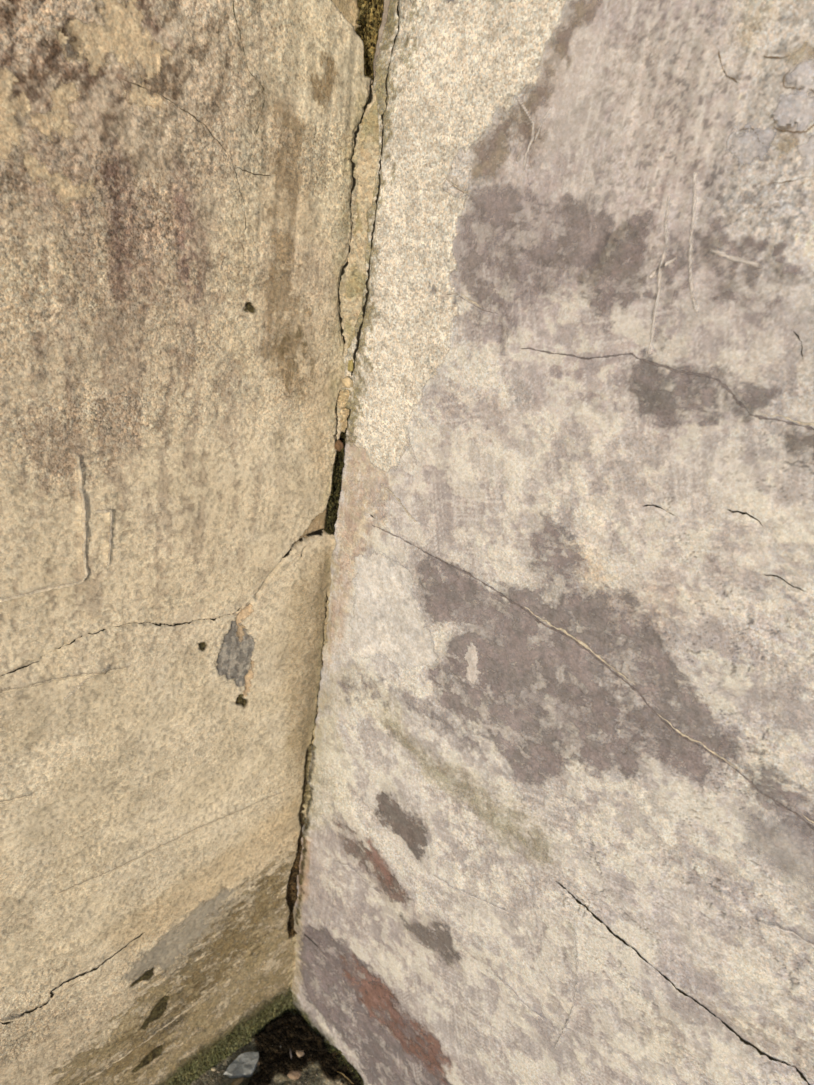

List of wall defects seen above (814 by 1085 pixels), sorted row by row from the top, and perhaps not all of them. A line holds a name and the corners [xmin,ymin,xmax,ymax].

crack [335,1,399,443]
water stain [460,0,657,325]
water stain [711,219,800,283]
crack [280,529,323,566]
crack [2,608,240,676]
water stain [405,517,740,785]
crack [289,594,328,952]
water stain [337,823,460,964]
water stain [374,792,427,860]
water stain [746,768,806,811]
crack [0,934,142,1025]
water stain [49,852,451,1085]